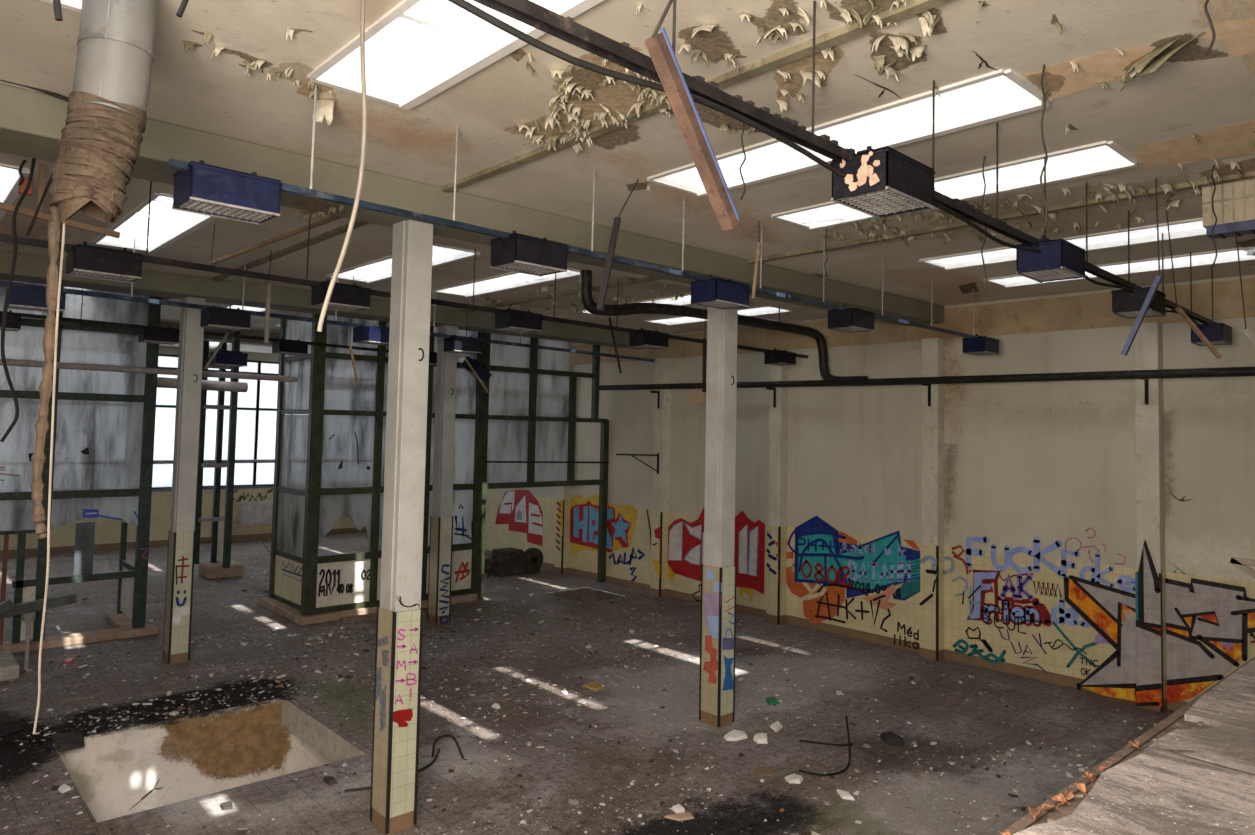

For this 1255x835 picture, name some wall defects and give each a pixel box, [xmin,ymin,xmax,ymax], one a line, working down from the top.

peeling [183,30,337,126]
peeling [286,28,312,41]
peeling [503,48,674,154]
peeling [694,102,763,136]
peeling [678,0,810,75]
peeling [773,46,844,114]
peeling [819,0,947,83]
peeling [1026,0,1255,108]
peeling [840,151,880,191]
peeling [1061,121,1255,234]
peeling [824,193,1059,247]